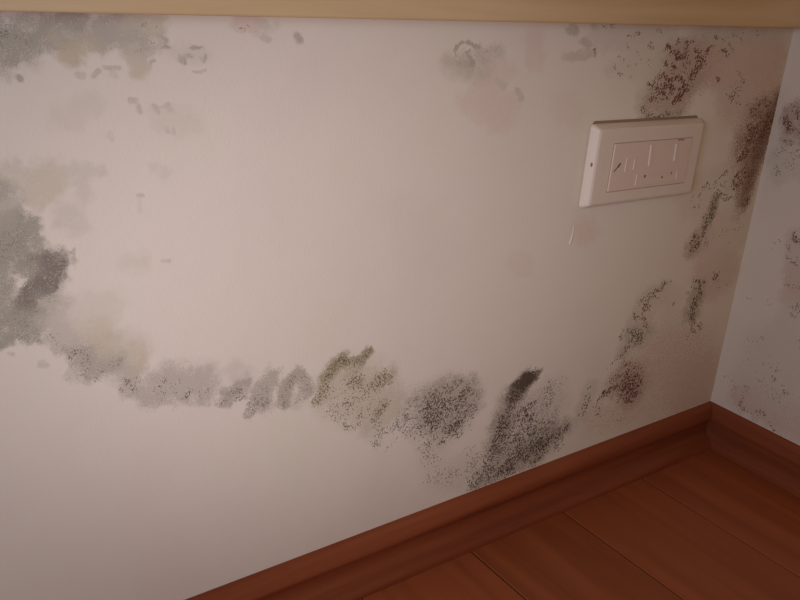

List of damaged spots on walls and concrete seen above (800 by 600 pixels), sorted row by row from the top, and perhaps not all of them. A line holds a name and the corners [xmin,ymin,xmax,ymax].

damp [0,11,213,84]
damp [0,23,800,496]